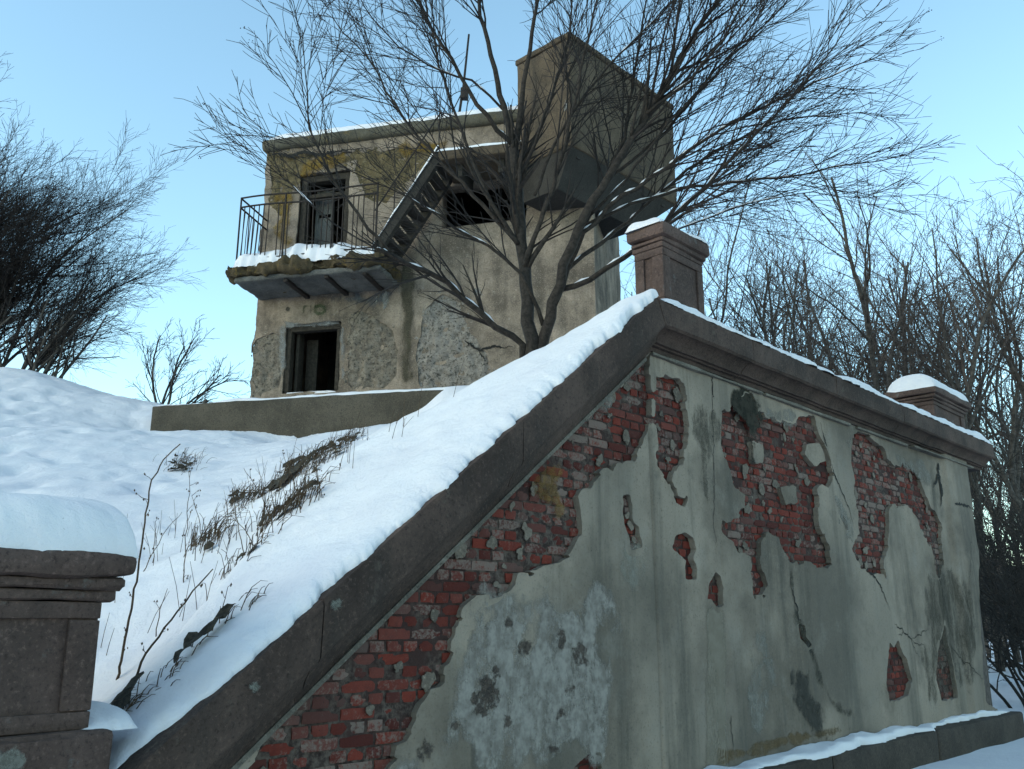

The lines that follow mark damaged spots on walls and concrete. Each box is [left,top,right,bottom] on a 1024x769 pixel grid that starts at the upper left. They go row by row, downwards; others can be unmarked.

spalling [341,311,398,392]
spalling [412,290,495,388]
crack [464,340,508,361]
flaking render [721,402,829,595]
flaking render [851,433,940,574]
flaking render [248,363,684,769]
flaking render [672,534,693,580]
flaking render [708,576,718,606]
crack [867,463,984,680]
flaking render [886,647,909,700]
flaking render [936,638,953,700]